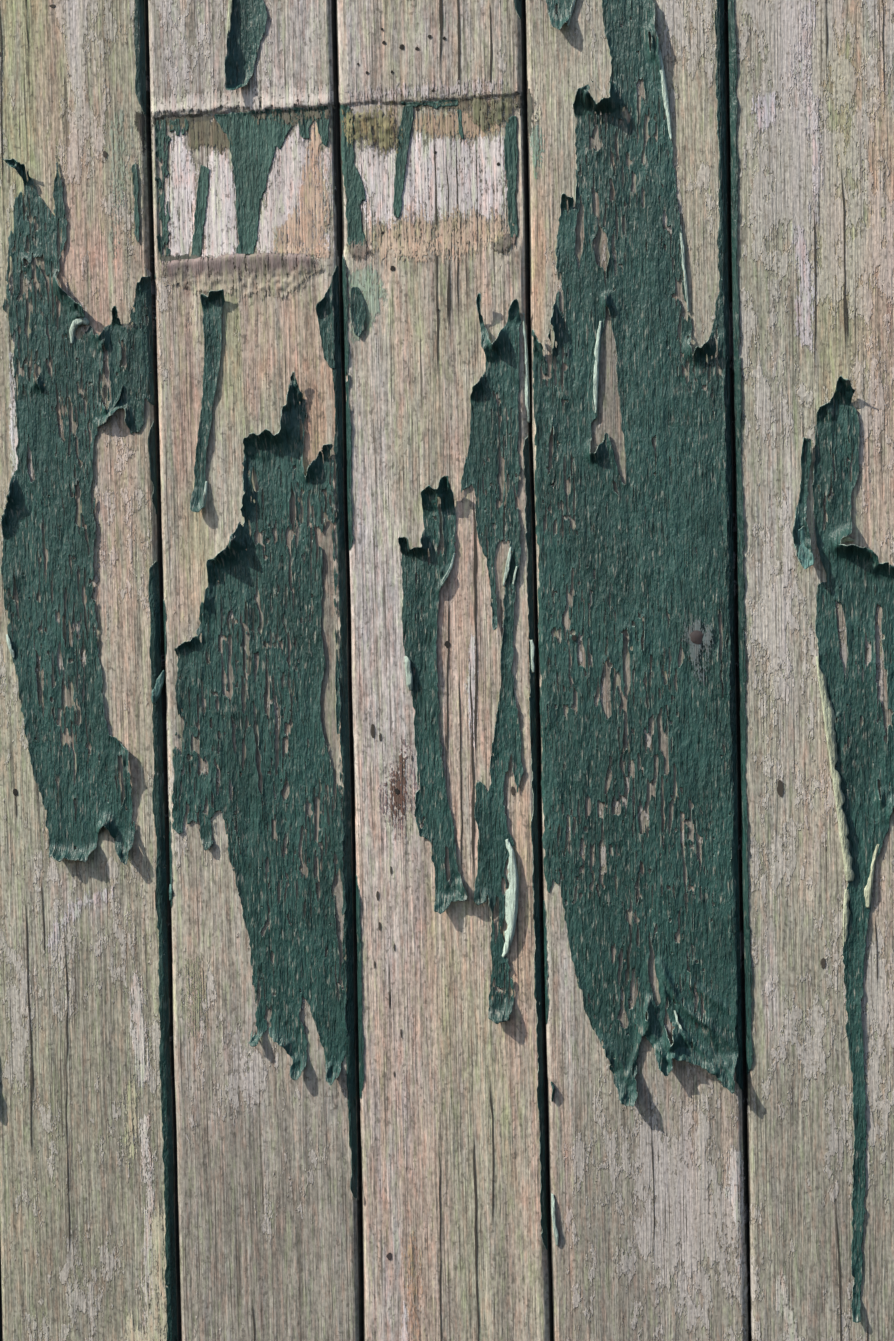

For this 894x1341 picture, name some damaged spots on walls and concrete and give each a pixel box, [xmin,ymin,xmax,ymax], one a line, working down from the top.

peeling [1,155,156,865]
peeling [190,289,225,513]
peeling [224,0,268,91]
peeling [172,372,348,1086]
peeling [398,0,739,1107]
peeling [792,376,894,1323]